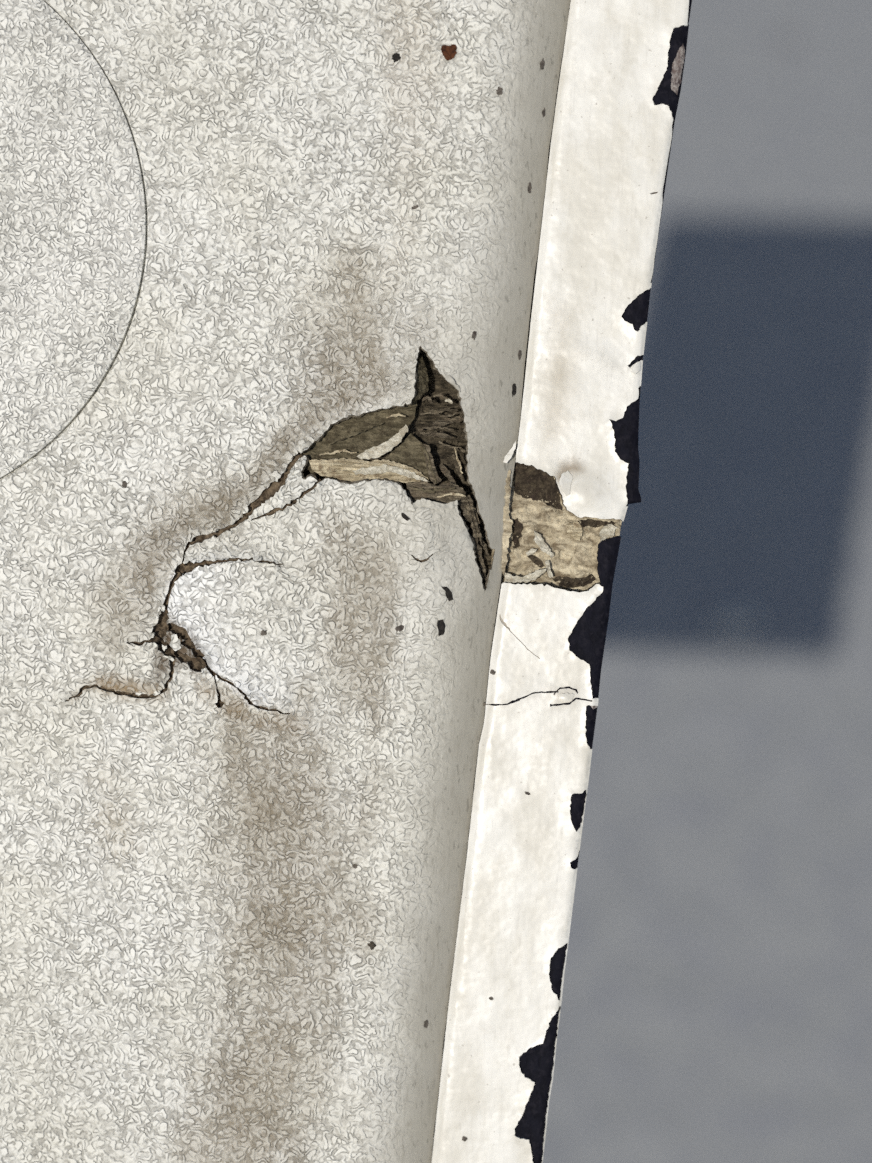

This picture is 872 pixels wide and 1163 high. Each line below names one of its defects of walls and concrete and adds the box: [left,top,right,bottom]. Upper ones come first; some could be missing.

crack [66,452,324,713]
spalling [303,469,343,481]
spalling [365,347,622,749]
peeling [609,355,643,506]